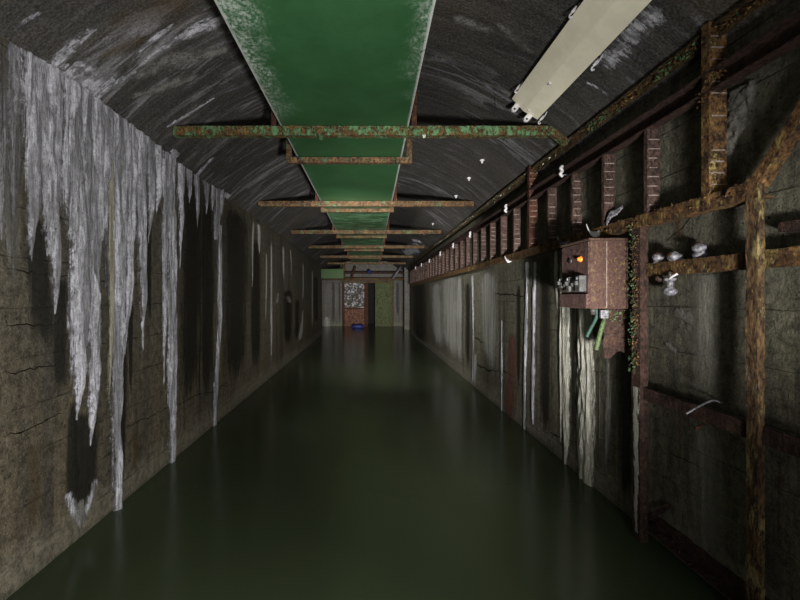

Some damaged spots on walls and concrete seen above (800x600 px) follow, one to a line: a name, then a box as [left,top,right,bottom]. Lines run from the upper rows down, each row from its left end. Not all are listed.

damp [0,15,340,528]
crack [1,365,55,378]
crack [2,413,61,440]
damp [413,272,503,410]
damp [517,250,611,487]